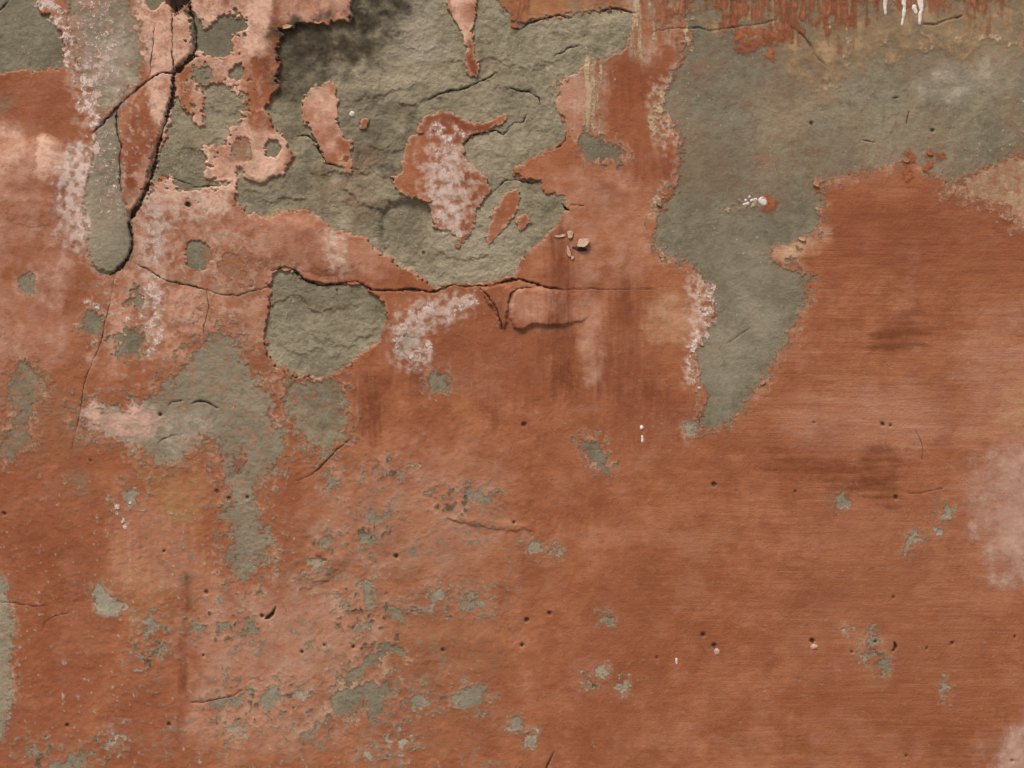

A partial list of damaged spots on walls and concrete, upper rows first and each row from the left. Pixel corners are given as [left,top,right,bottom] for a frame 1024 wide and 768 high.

flaking render [0,0,633,291]
crack [72,3,647,447]
flaking render [644,0,1024,438]
efflorescence [393,289,479,373]
efflorescence [686,284,717,389]
peeling [570,429,619,478]
peeling [0,267,504,768]
peeling [517,535,566,561]
peeling [503,710,539,751]